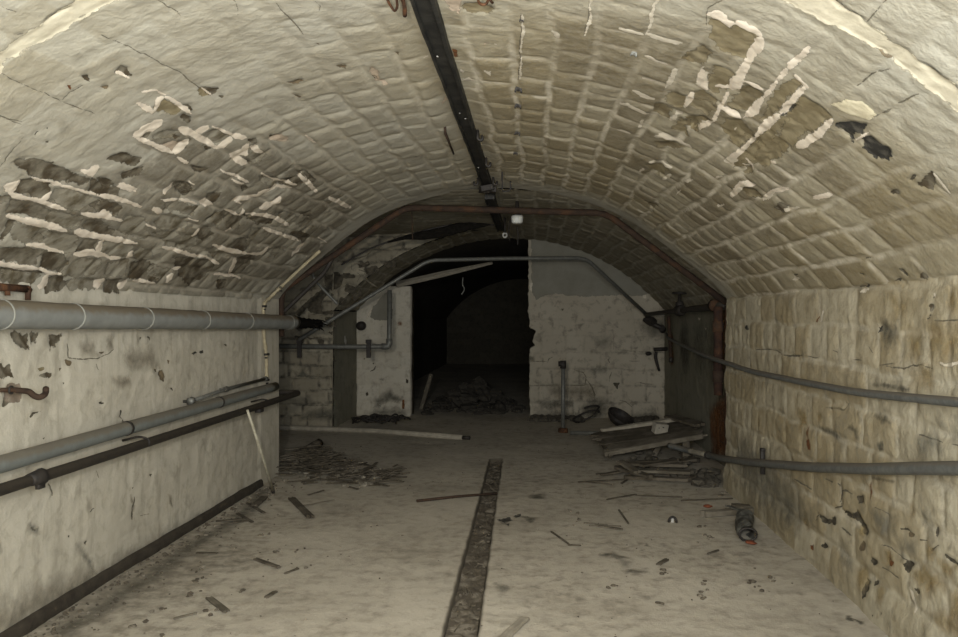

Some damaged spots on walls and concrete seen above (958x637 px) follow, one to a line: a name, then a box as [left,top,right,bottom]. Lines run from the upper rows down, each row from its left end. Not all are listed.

peeling [445,0,495,14]
peeling [0,0,119,75]
peeling [114,65,132,79]
peeling [197,86,223,98]
peeling [616,10,893,213]
peeling [783,0,958,113]
peeling [0,89,327,294]
peeling [328,196,351,209]
flaking render [910,171,951,194]
corrosion [711,399,725,456]